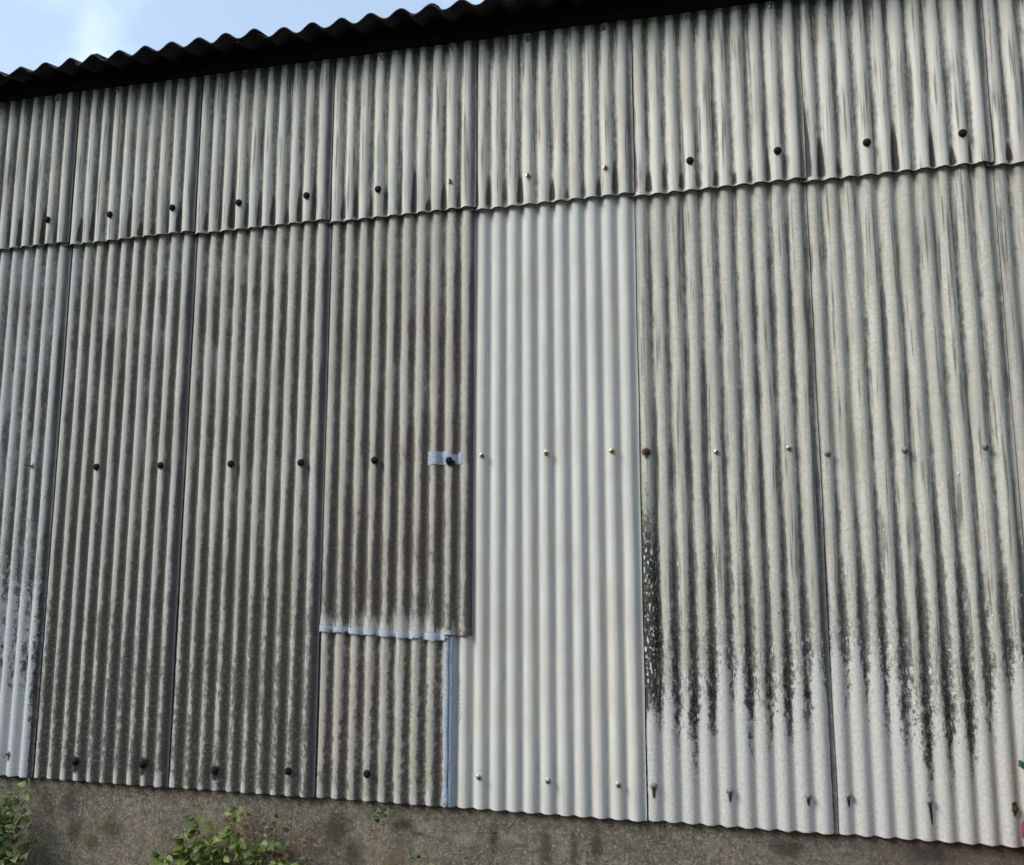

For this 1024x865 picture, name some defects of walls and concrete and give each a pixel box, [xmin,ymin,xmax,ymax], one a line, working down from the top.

damp [653,513,718,766]
damp [729,595,814,755]
damp [882,575,996,780]